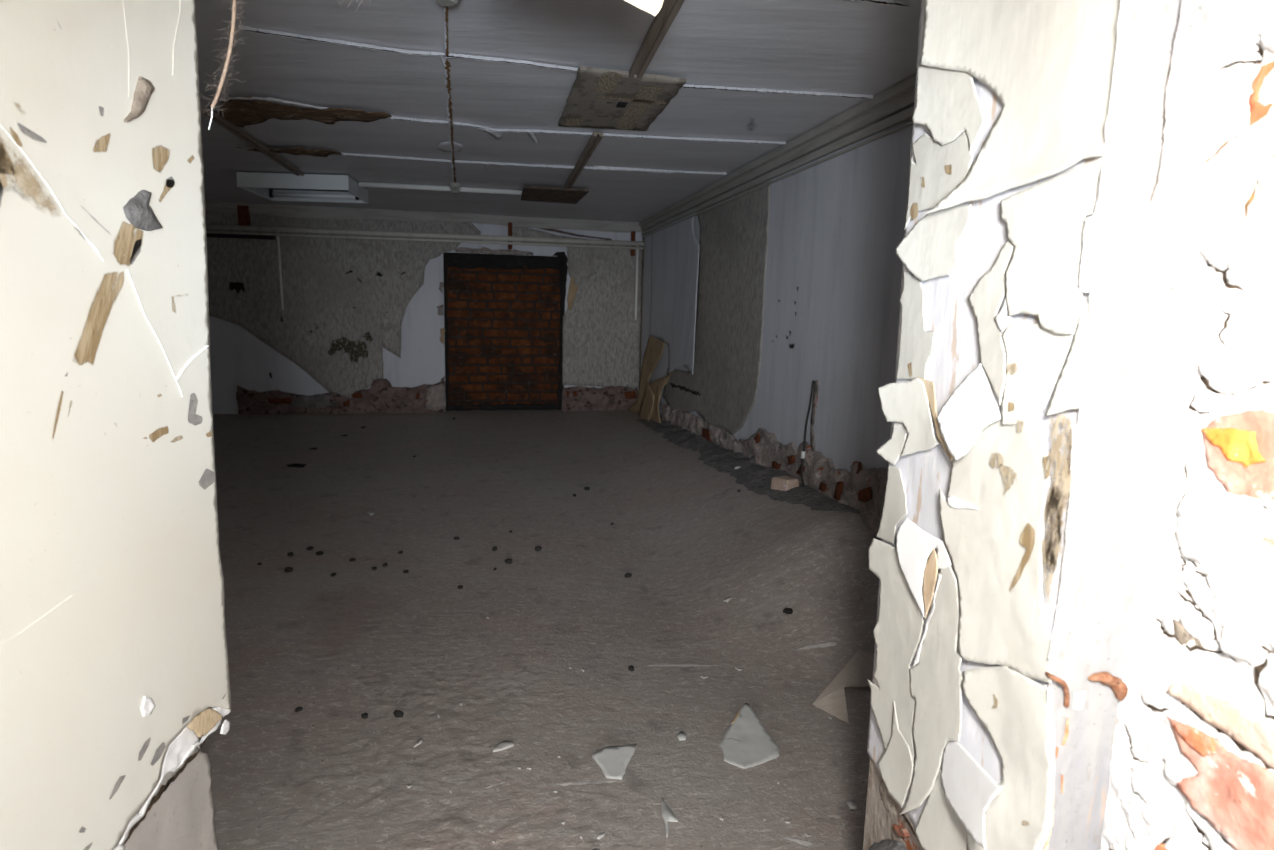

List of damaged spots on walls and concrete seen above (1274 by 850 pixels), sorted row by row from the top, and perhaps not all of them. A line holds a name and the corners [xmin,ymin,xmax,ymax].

peeling [624,0,664,16]
spalling [1248,50,1274,128]
water stain [0,137,55,211]
spalling [455,247,533,255]
spalling [236,376,446,415]
spalling [561,386,638,411]
peeling [660,0,1141,850]
flaking render [1200,410,1274,500]
spalling [109,775,126,799]
spalling [113,694,231,850]
peeling [592,744,637,780]
flaking render [1166,683,1274,850]